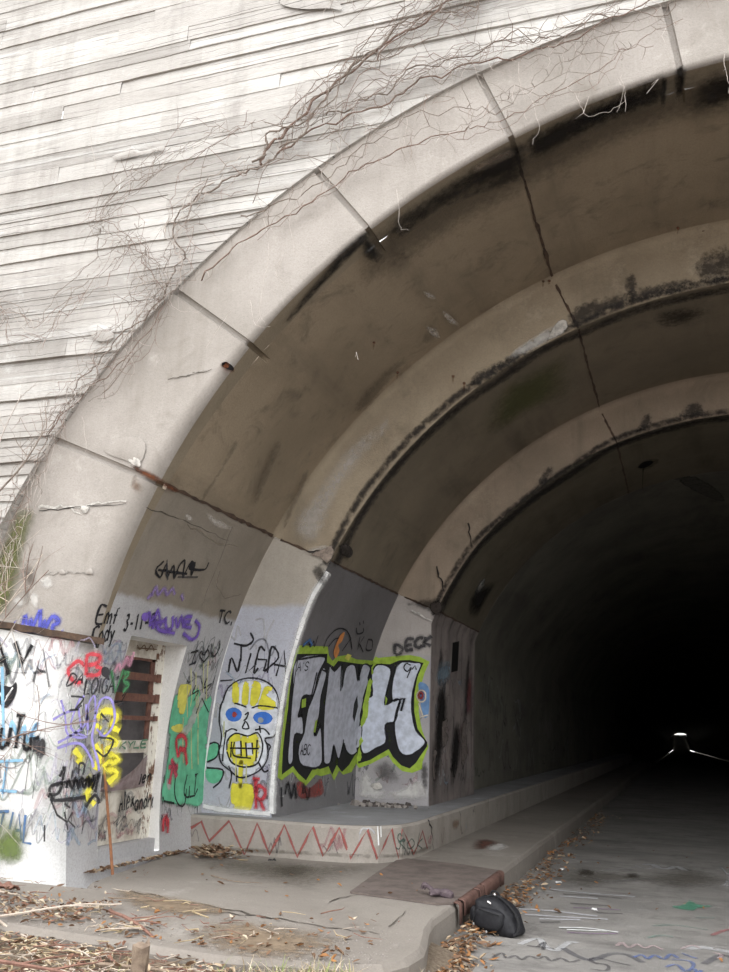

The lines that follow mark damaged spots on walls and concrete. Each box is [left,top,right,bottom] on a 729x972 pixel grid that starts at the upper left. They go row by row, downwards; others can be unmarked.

leakage [393,66,685,235]
leakage [289,234,379,318]
corrosion [133,466,178,492]
leakage [323,250,729,566]